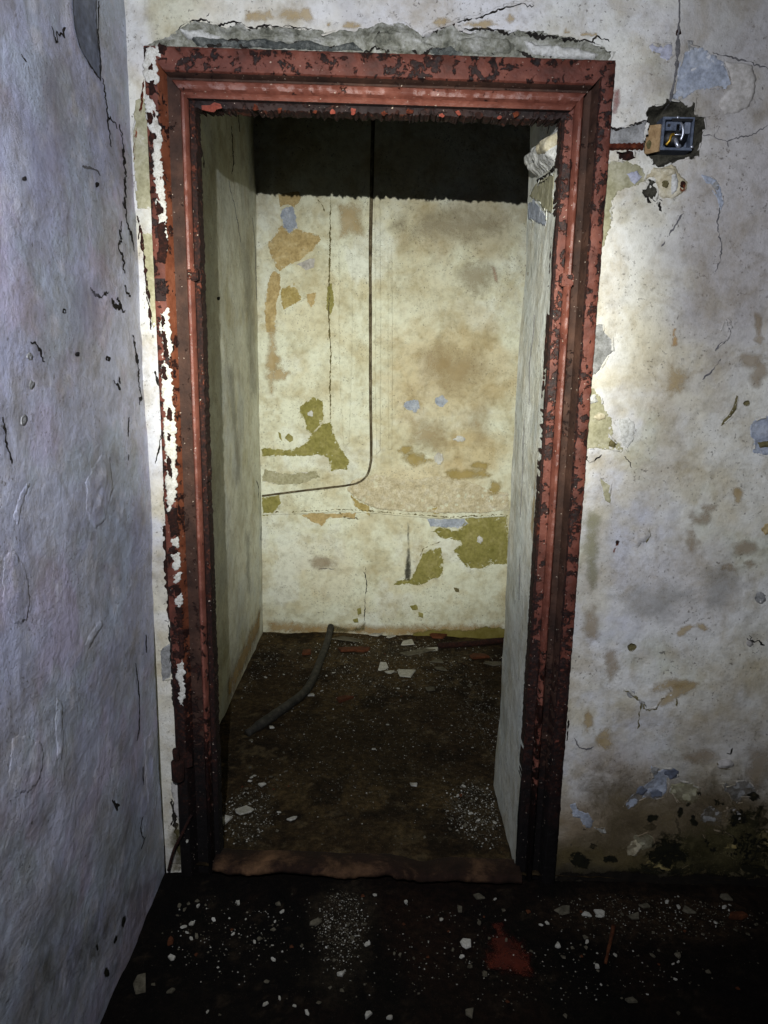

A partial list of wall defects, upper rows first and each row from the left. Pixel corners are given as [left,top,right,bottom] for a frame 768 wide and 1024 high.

corrosion [148,43,167,95]
spalling [145,20,615,60]
crack [611,0,681,131]
peeling [602,40,731,247]
crack [51,0,159,461]
corrosion [150,186,169,264]
crack [645,195,684,247]
corrosion [161,315,169,380]
leakage [266,329,287,388]
spalling [260,397,509,586]
leakage [446,462,500,494]
leakage [556,751,768,888]